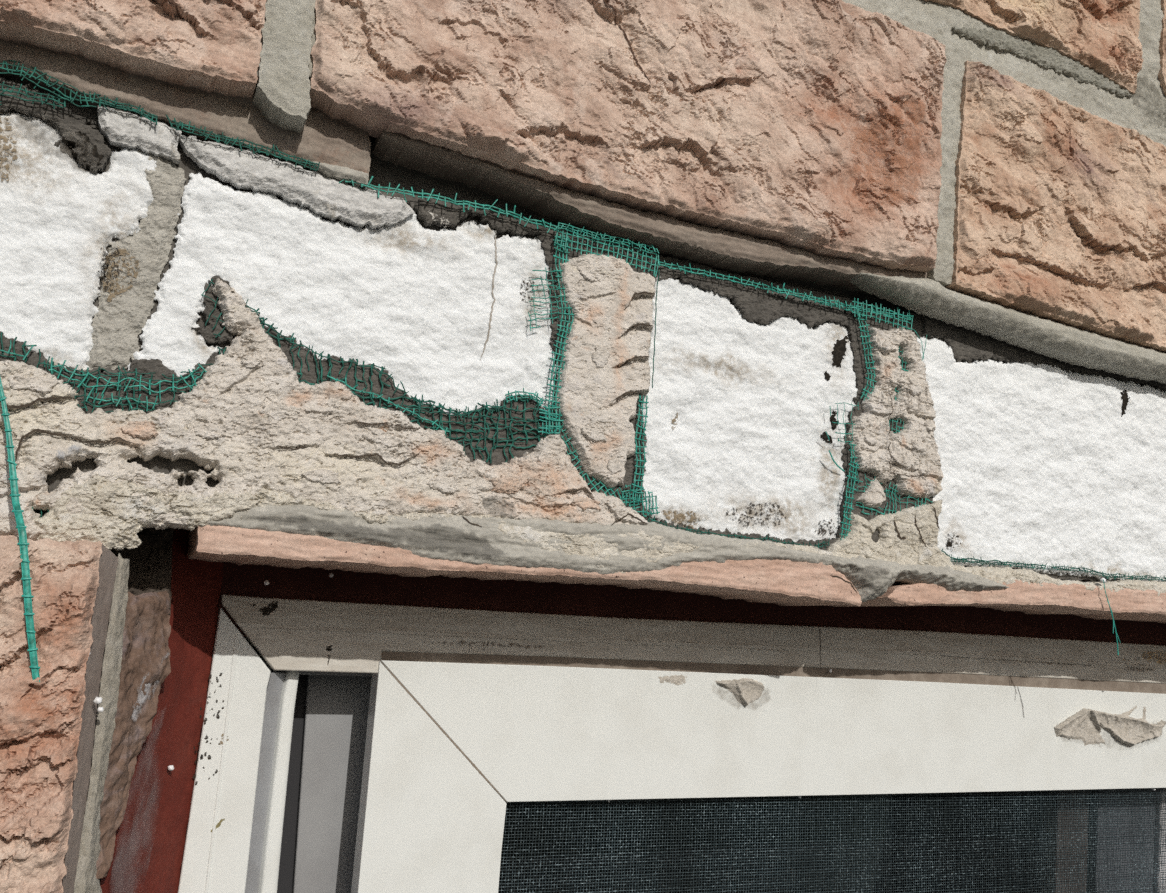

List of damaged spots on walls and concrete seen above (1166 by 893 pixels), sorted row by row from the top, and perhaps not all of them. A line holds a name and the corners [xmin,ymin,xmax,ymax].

spalling [0,60,320,174]
crack [480,230,498,361]
flaking render [0,176,1166,615]